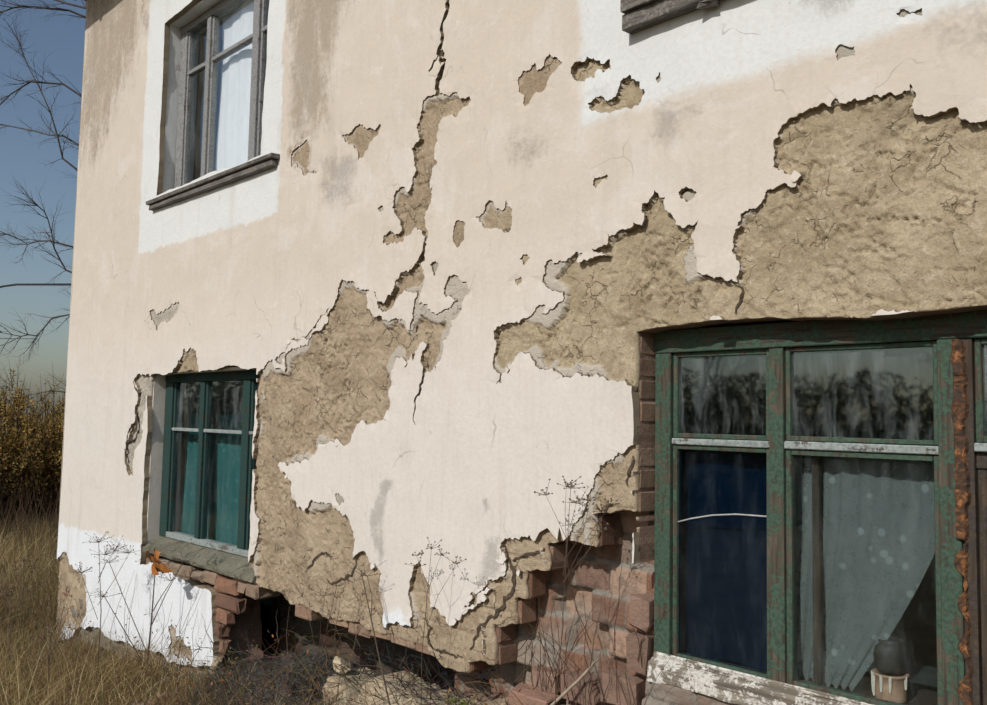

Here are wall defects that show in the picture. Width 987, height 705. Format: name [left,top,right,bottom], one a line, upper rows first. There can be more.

crack [438,40,446,93]
peeling [519,55,562,106]
spalling [575,59,611,81]
spalling [589,77,645,113]
peeling [343,125,381,158]
spalling [494,86,987,392]
peeling [151,303,180,330]
spalling [177,349,199,373]
spalling [127,374,156,474]
spalling [252,262,641,673]
spalling [56,552,87,637]
spalling [642,675,740,705]